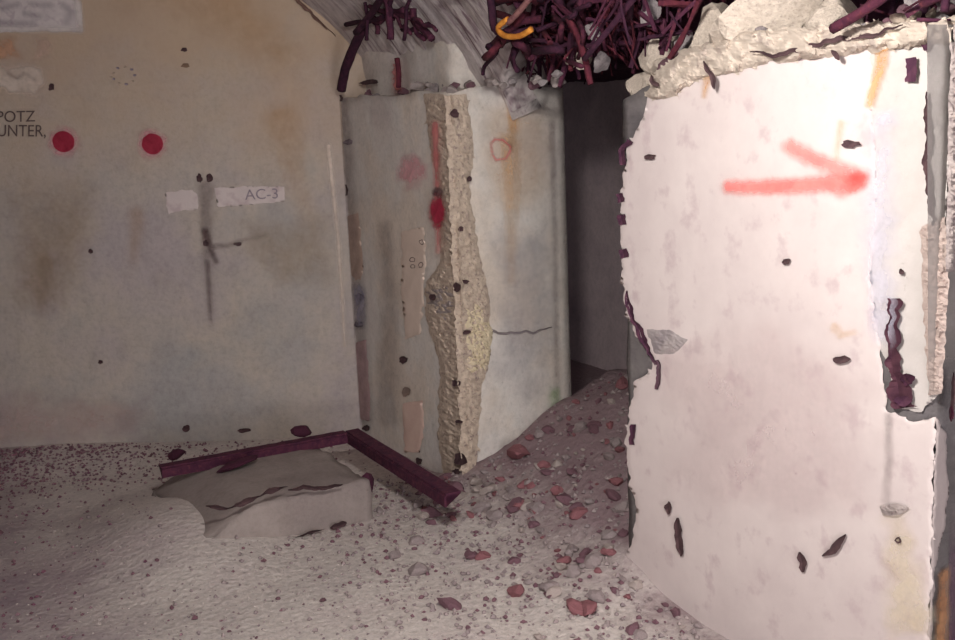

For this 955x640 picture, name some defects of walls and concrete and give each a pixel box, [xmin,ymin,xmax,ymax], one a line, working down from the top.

peeling [348,213,364,281]
spalling [394,0,638,475]
peeling [356,340,370,421]
crack [490,327,552,355]
peeling [615,0,955,640]